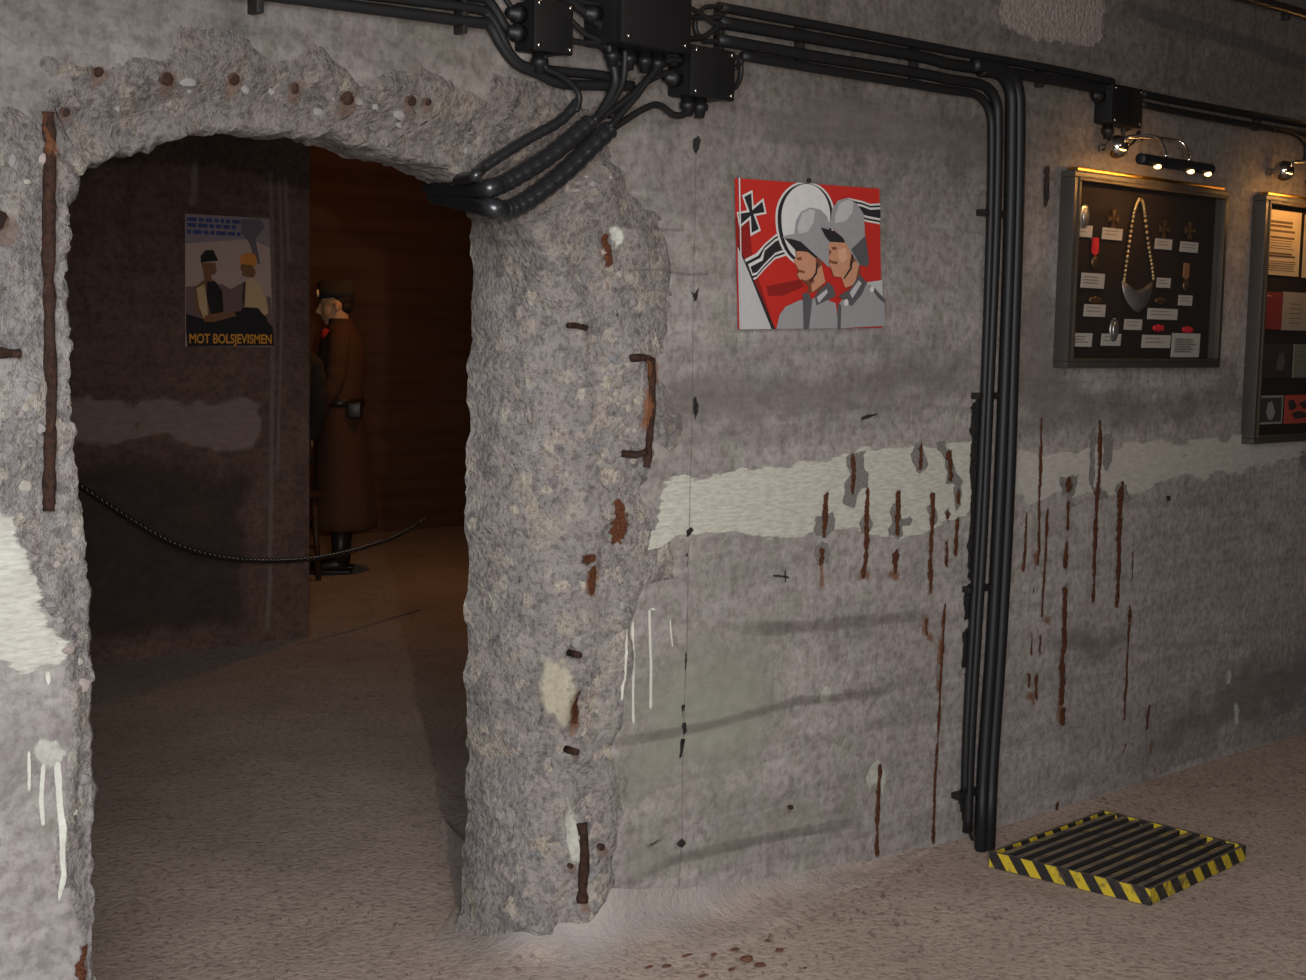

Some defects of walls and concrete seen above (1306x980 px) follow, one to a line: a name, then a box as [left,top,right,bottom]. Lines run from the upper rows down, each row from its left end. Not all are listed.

rust [41,111,58,511]
spalling [0,23,601,980]
rust [608,499,629,546]
rust [621,354,657,468]
spalling [455,145,972,936]
rust [813,451,912,587]
rust [911,441,963,593]
rust [1022,417,1133,726]
peeling [1015,433,1306,506]
damp [621,608,764,778]
damp [27,751,67,900]
rust [576,822,590,904]